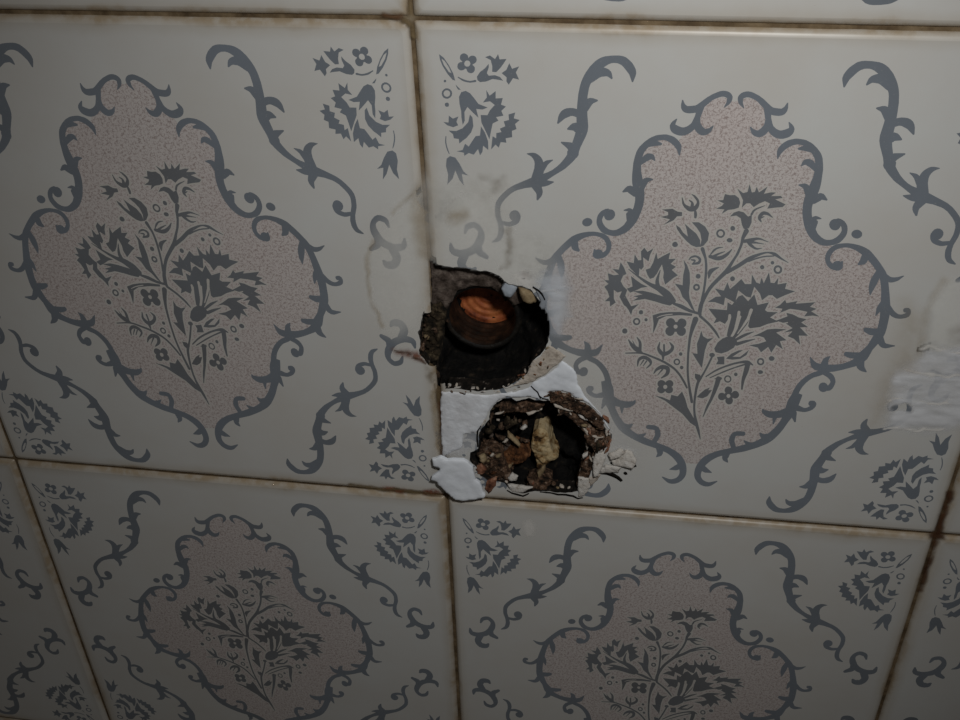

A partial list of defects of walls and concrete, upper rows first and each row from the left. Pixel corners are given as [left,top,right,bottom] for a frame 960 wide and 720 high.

spalling [420,257,637,501]
rust [919,491,953,591]